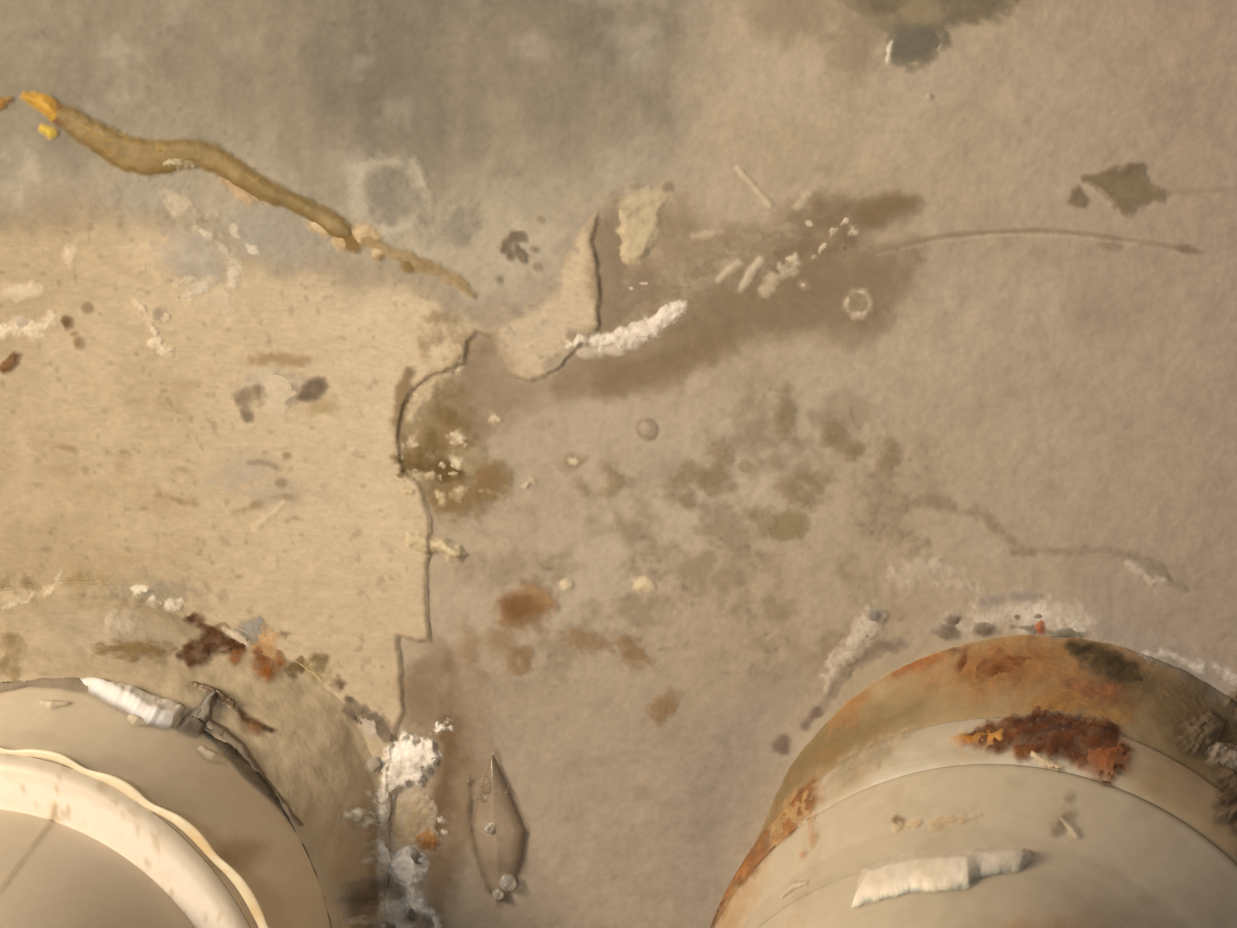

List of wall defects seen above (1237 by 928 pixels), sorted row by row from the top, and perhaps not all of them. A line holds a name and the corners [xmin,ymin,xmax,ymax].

leakage [837,0,1016,72]
crack [0,92,473,298]
crack [844,228,1197,253]
leakage [458,196,920,446]
leakage [748,475,826,540]
rust [96,612,285,682]
leakage [238,617,265,643]
leakage [286,654,328,678]
rust [890,640,1146,687]
rust [957,706,1133,785]
leakage [335,651,490,928]
rust [710,779,816,928]